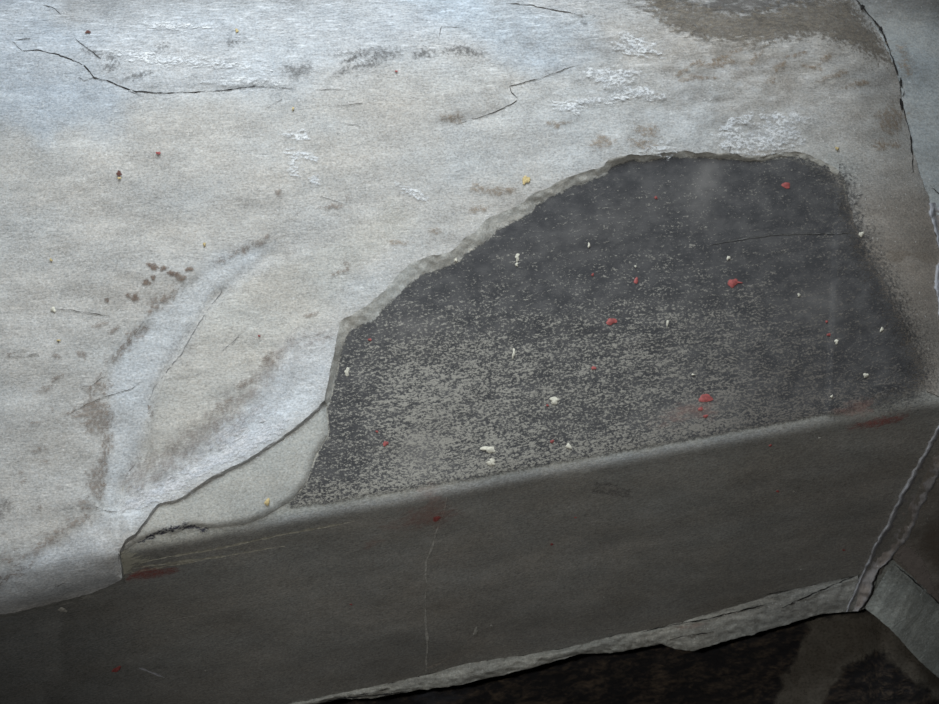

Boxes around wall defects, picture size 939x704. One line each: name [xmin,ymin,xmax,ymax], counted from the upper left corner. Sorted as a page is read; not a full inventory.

crack [14,38,293,108]
crack [456,66,573,125]
efflorescence [552,66,666,119]
efflorescence [611,32,662,59]
leakage [636,0,893,68]
crack [857,0,913,168]
spalling [120,150,937,574]
spalling [291,576,861,704]